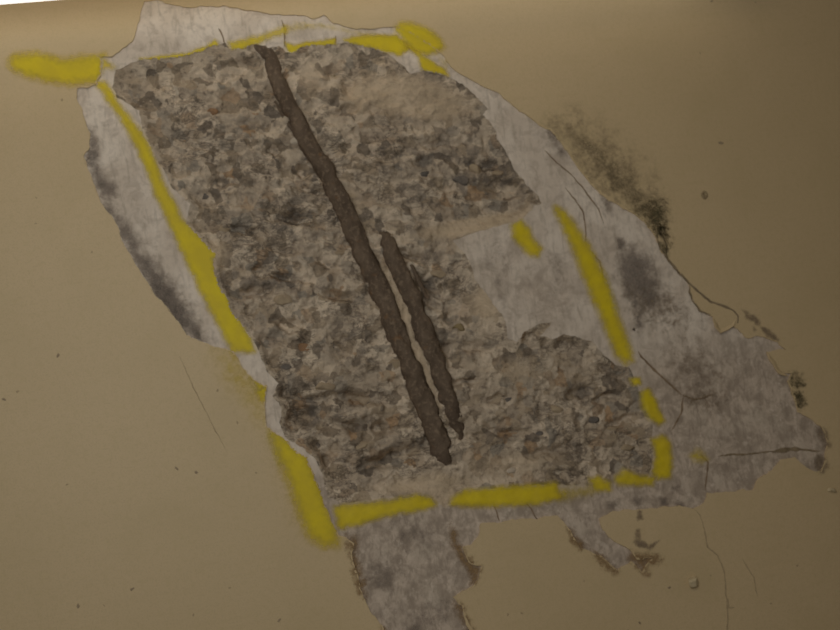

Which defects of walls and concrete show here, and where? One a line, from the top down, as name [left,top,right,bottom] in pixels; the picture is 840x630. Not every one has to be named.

spalling [97,0,827,509]
damp [635,199,671,257]
crack [701,447,820,490]